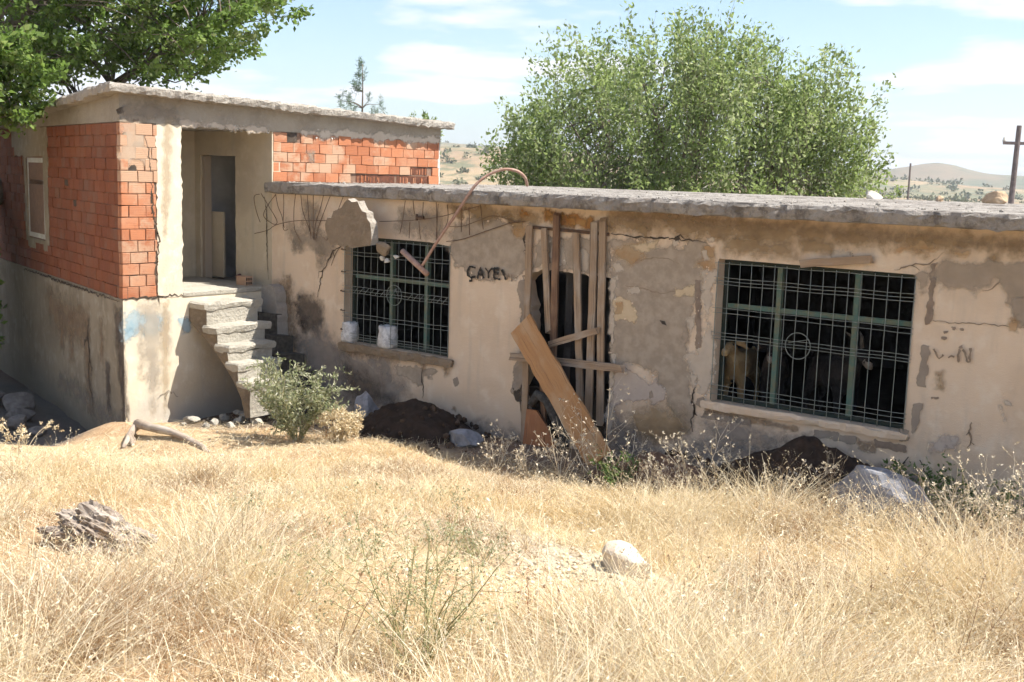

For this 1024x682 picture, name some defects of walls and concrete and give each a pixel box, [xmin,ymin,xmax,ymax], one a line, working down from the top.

crack [24,139,184,303]
damp [48,289,191,422]
crack [317,246,342,297]
damp [280,283,405,405]
peeling [254,193,798,436]
crack [611,233,705,263]
damp [609,211,1024,328]